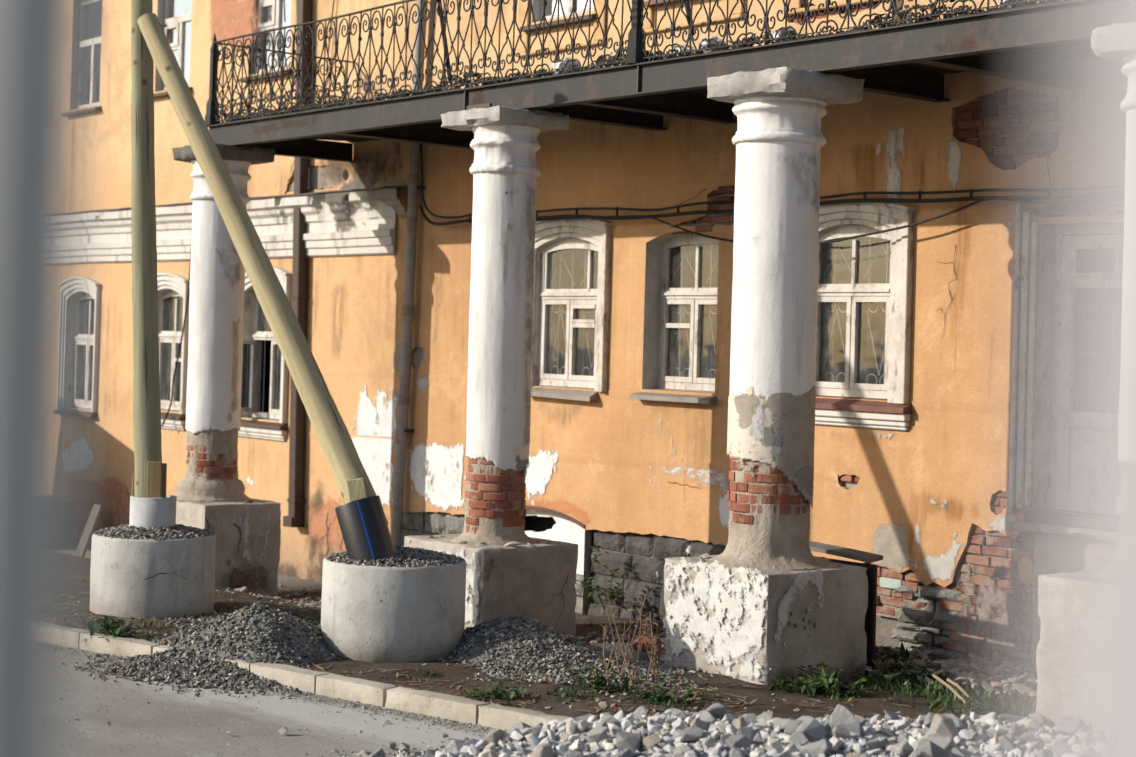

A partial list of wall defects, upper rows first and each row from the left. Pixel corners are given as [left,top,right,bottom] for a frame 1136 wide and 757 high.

flaking render [953,87,1061,170]
crack [937,244,959,335]
flaking render [186,445,254,486]
peeling [349,384,398,507]
peeling [649,386,816,531]
peeling [656,546,771,680]